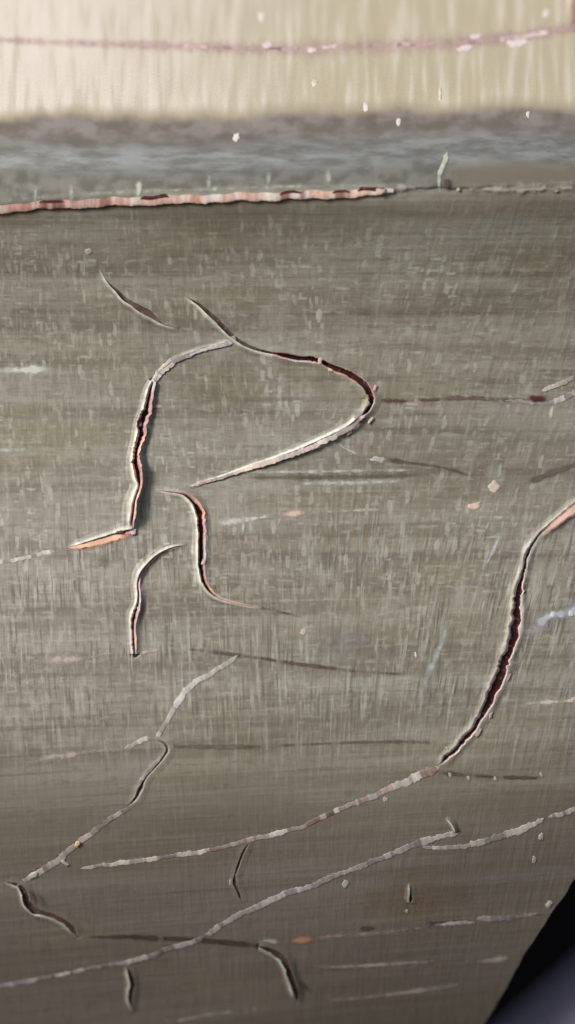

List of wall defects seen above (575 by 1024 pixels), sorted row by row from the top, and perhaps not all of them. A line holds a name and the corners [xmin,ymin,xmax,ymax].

crack [0,151,573,214]
crack [66,292,575,667]
crack [0,495,575,1014]